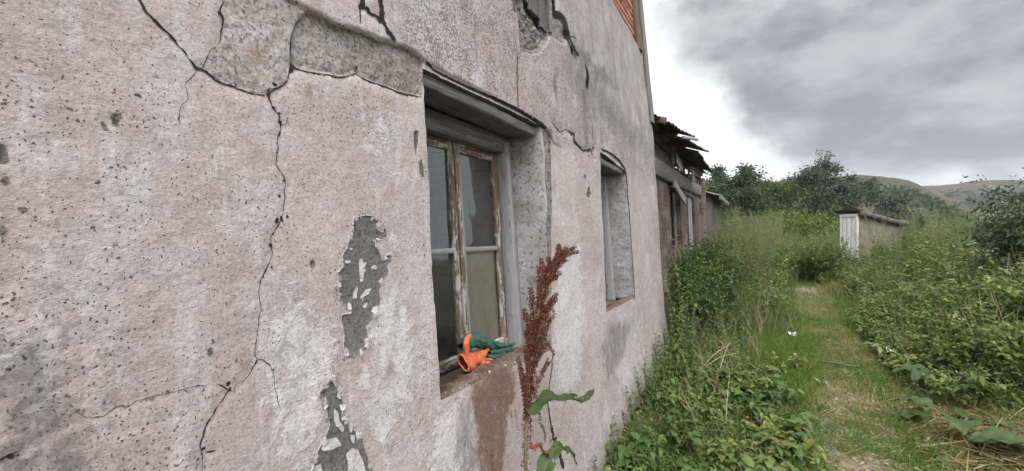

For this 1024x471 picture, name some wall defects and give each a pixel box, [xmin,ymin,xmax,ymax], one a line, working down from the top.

flaking render [204,0,423,97]
flaking render [512,0,566,53]
crack [75,0,417,470]
peeling [334,214,392,359]
crack [426,58,635,297]
peeling [310,375,374,471]